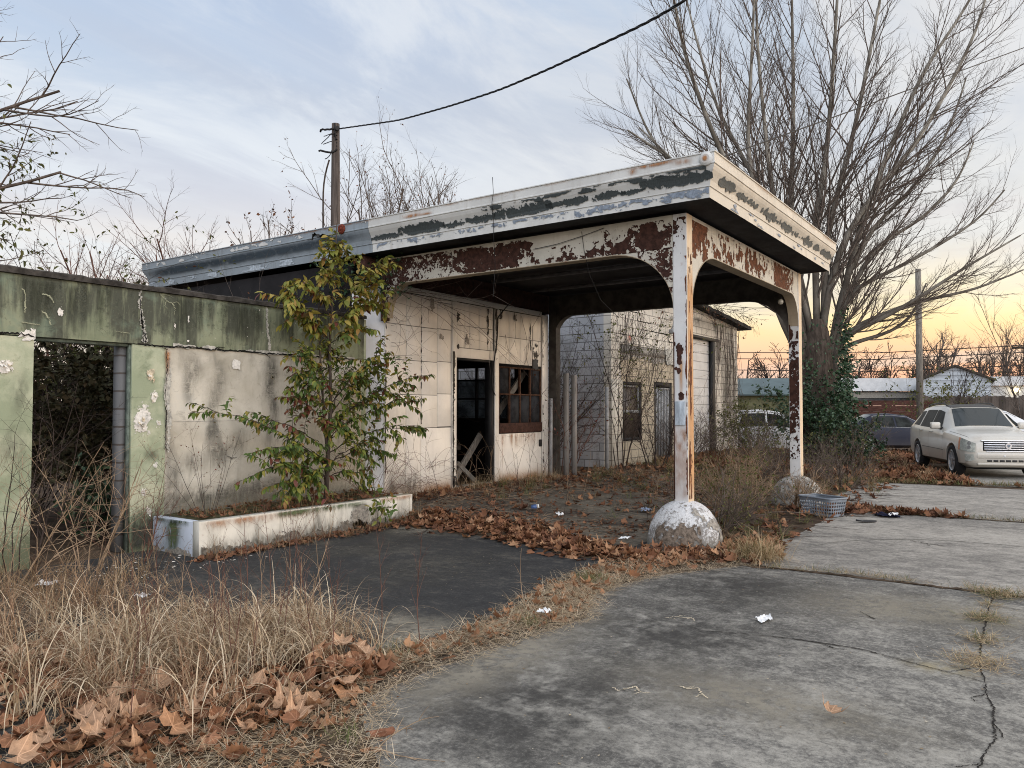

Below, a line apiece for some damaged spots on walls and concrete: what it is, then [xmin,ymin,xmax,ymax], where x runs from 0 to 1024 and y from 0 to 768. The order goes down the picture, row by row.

peeling [371,165,834,267]
peeling [0,360,14,374]
spalling [134,358,173,452]
rust [386,216,794,499]
rust [789,341,800,459]
crack [665,595,1021,768]